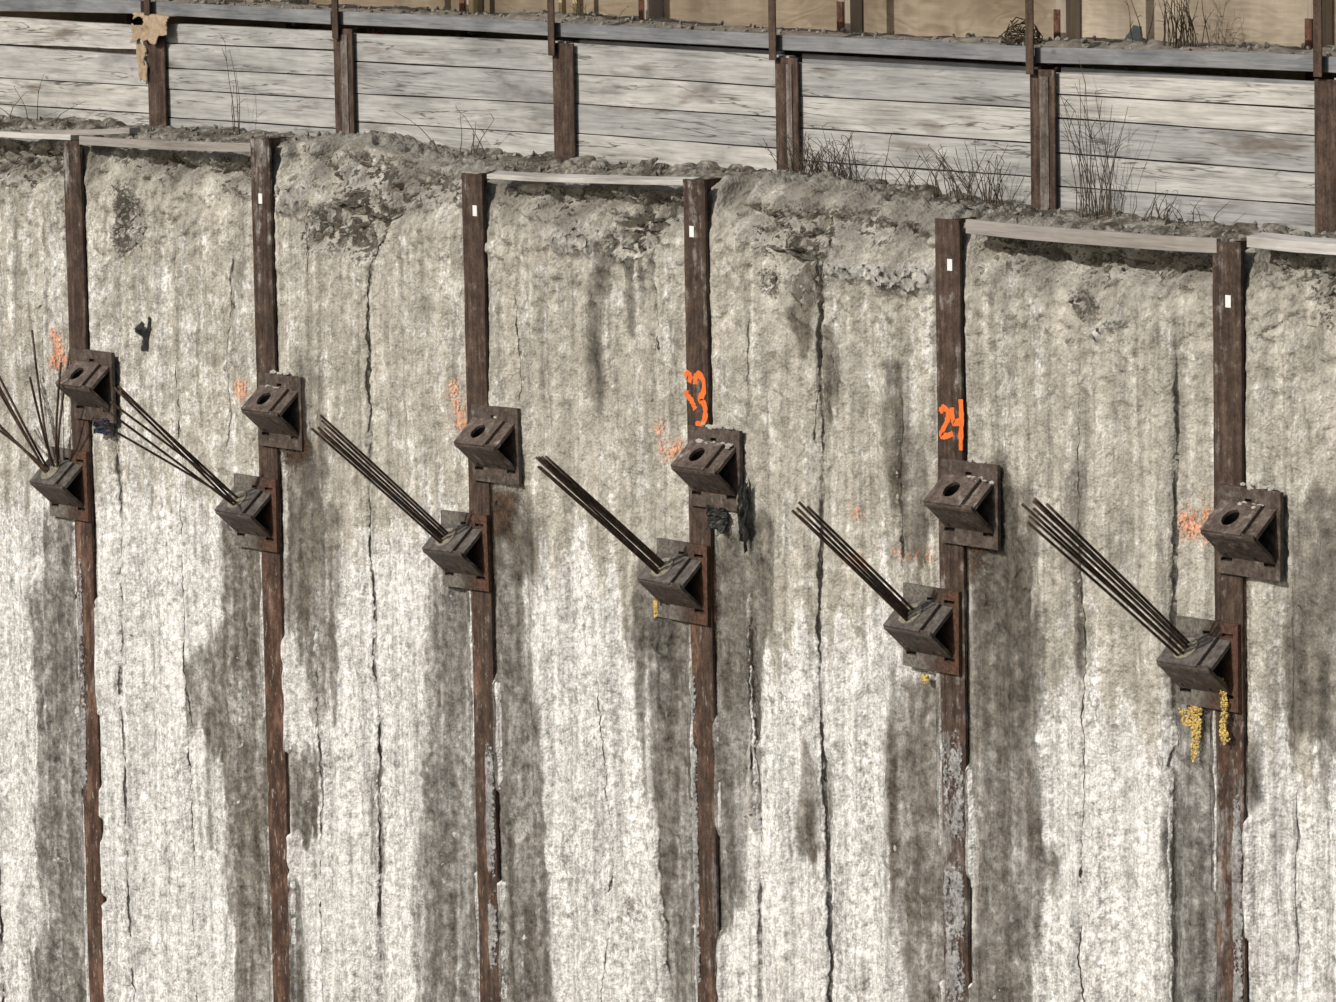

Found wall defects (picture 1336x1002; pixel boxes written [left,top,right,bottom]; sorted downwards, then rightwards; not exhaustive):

crack [0,893,8,1002]
leakage [184,519,271,1002]
crack [365,208,406,956]
leakage [411,569,479,1002]
leakage [492,490,552,1002]
leakage [625,558,696,1002]
crack [813,264,834,1002]
leakage [883,674,944,1002]
crack [1166,678,1178,1001]
crack [1168,358,1179,643]
leakage [1160,694,1217,1002]